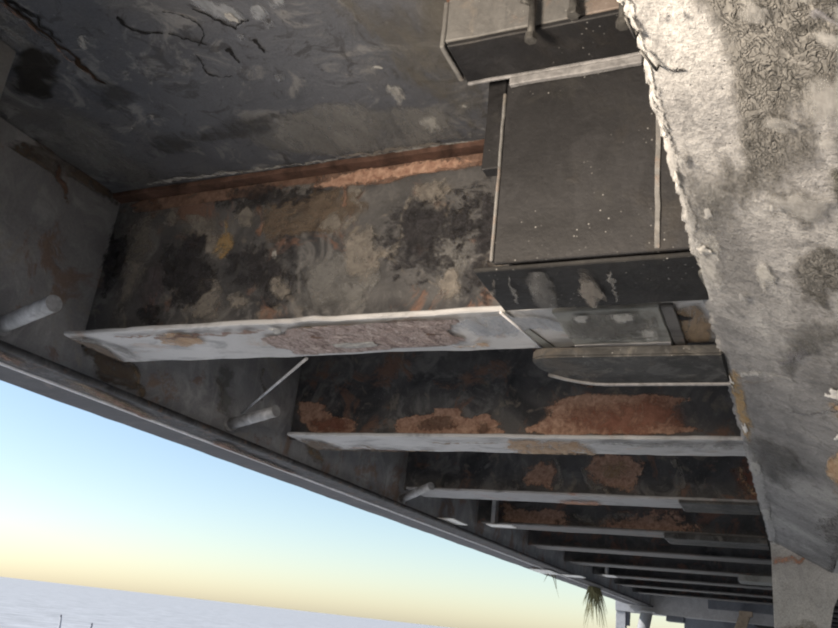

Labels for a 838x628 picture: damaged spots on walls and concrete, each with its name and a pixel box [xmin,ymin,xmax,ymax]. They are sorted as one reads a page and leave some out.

leakage [0,14,60,99]
crack [0,0,106,84]
crack [116,8,265,77]
leakage [688,0,838,288]
corrosion [130,153,483,213]
leakage [579,272,618,308]
leakage [794,248,838,307]
peeling [261,319,465,355]
spalling [824,388,838,417]
corrosion [297,384,701,494]
spalling [826,452,838,485]
corrosion [499,501,703,532]